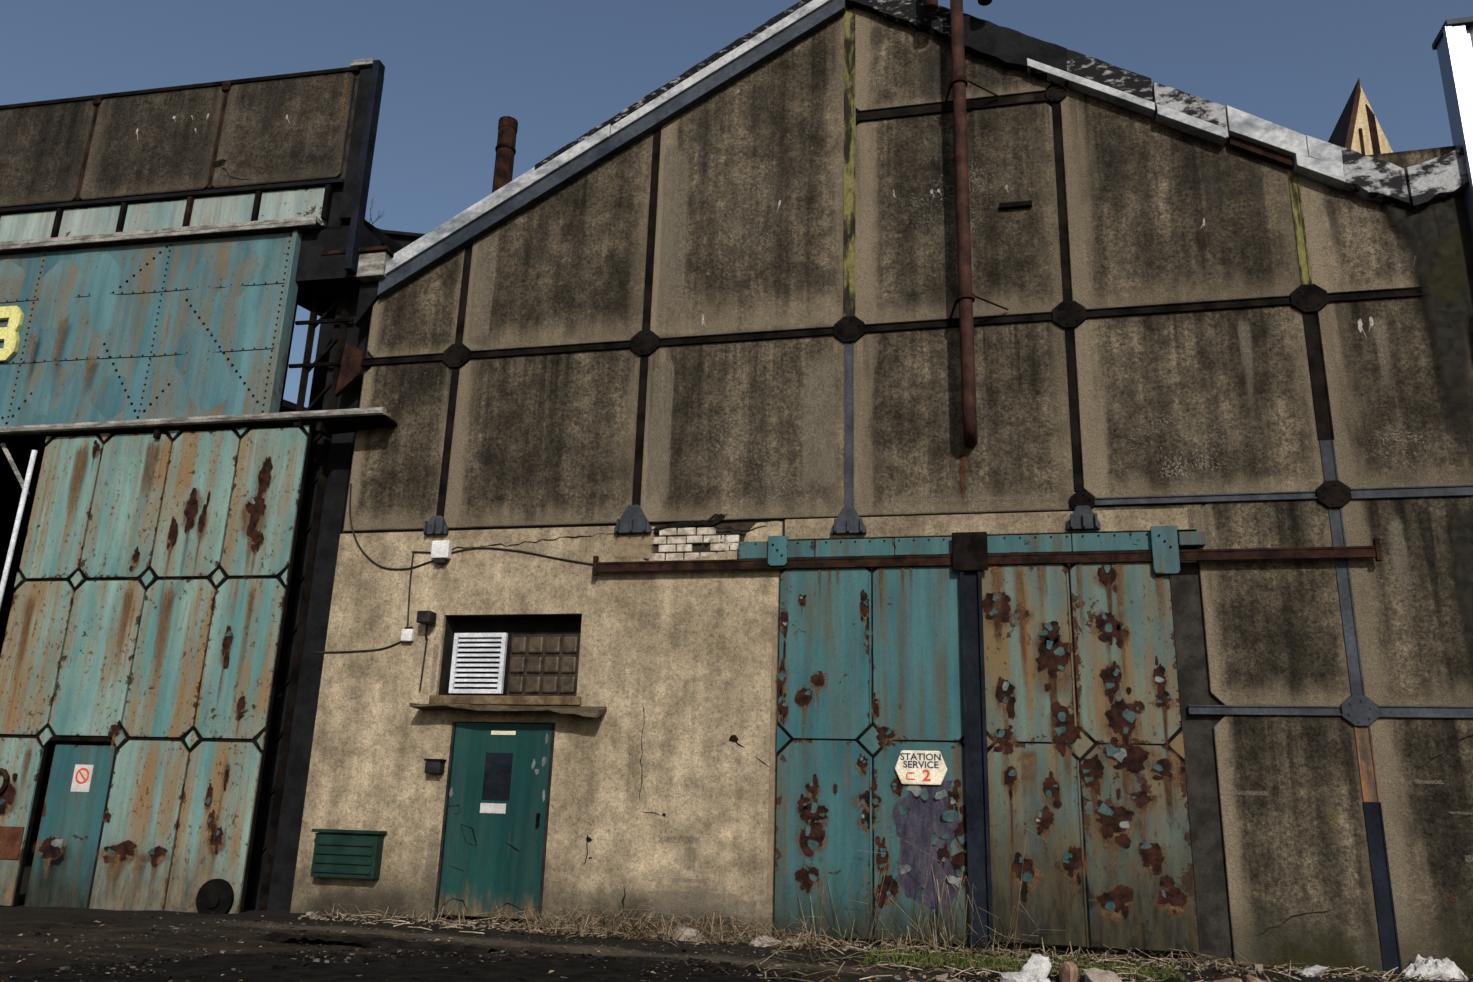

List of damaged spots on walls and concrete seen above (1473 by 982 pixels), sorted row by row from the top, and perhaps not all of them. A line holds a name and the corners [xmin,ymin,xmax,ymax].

water stain [658,150,689,320]
water stain [469,240,497,339]
water stain [1239,324,1251,363]
corrosion [70,449,87,494]
corrosion [143,444,159,487]
water stain [647,362,674,501]
water stain [708,360,836,499]
spalling [645,514,753,561]
corrosion [20,599,33,657]
corrosion [158,590,173,653]
peeling [794,774,837,893]
peeling [857,692,968,914]